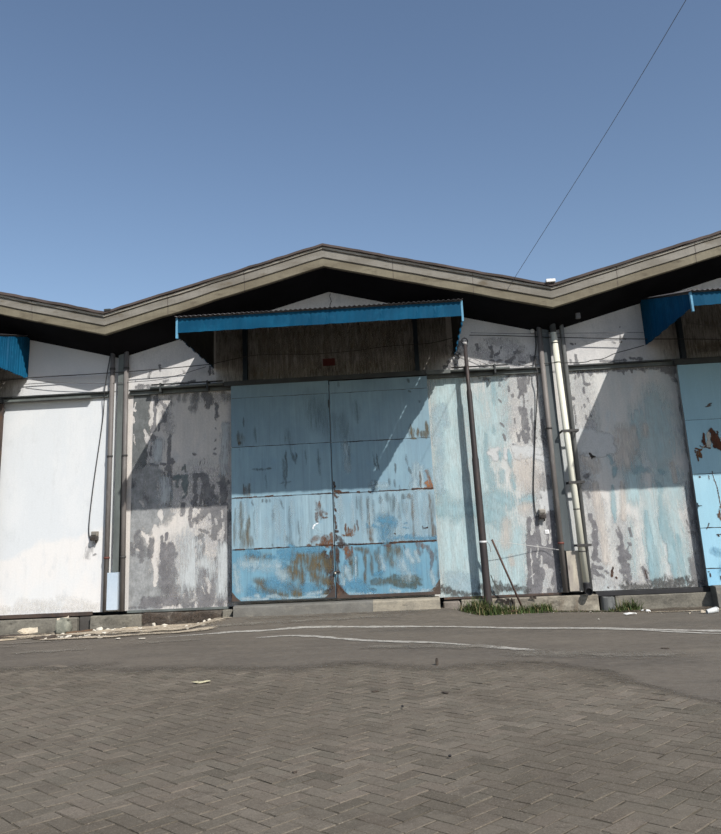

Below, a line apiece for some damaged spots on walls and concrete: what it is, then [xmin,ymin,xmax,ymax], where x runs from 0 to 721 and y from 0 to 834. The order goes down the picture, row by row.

peeling [475,343,536,381]
peeling [570,343,593,400]
peeling [500,374,547,445]
peeling [132,375,232,625]
rust [235,476,437,599]
peeling [526,510,562,599]
peeling [588,513,609,579]
peeling [616,527,633,584]